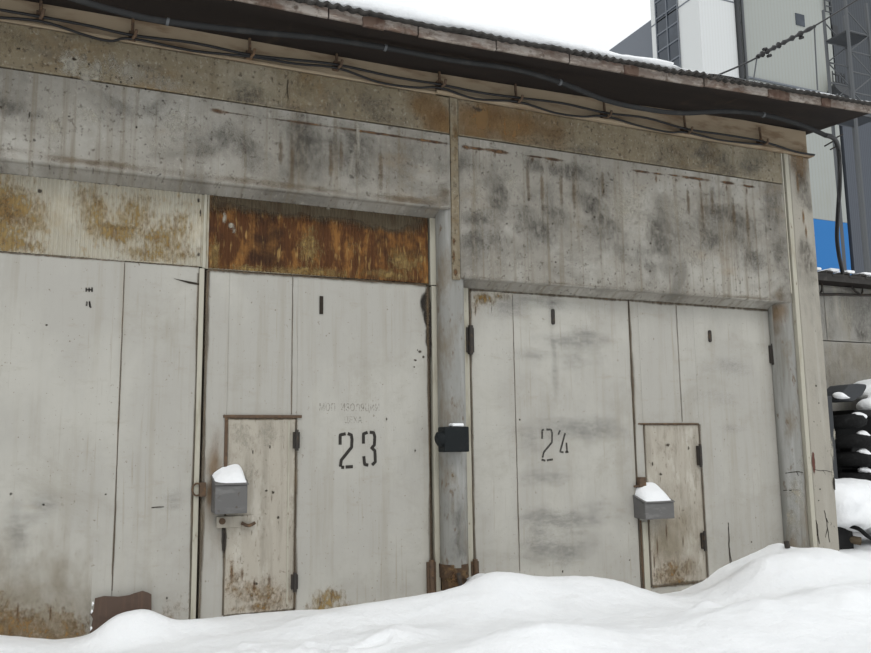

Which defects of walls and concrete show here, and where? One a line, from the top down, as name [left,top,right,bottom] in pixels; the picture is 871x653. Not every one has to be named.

rust [0,180,46,253]
rust [78,189,194,261]
rust [208,195,428,283]
rust [0,605,86,639]
rust [226,568,281,610]